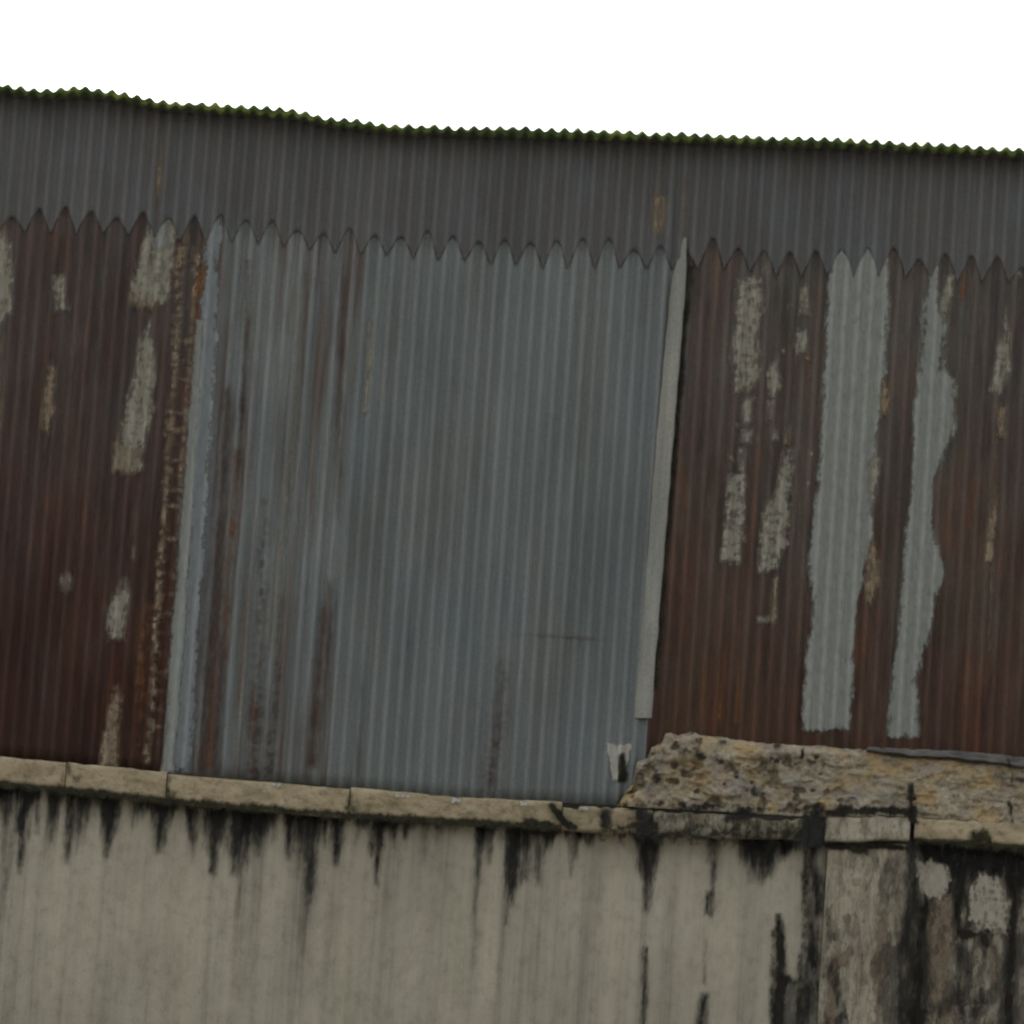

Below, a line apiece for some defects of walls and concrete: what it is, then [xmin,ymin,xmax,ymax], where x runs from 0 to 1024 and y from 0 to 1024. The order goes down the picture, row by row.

peeling [112,320,156,472]
rust [138,229,208,763]
peeling [160,215,223,773]
peeling [720,276,781,563]
peeling [801,249,891,732]
peeling [887,265,965,738]
leakage [0,787,120,866]
leakage [134,800,344,895]
leakage [505,825,594,897]
leakage [739,839,847,1024]
spalling [915,857,954,1024]
leakage [875,821,1024,1024]